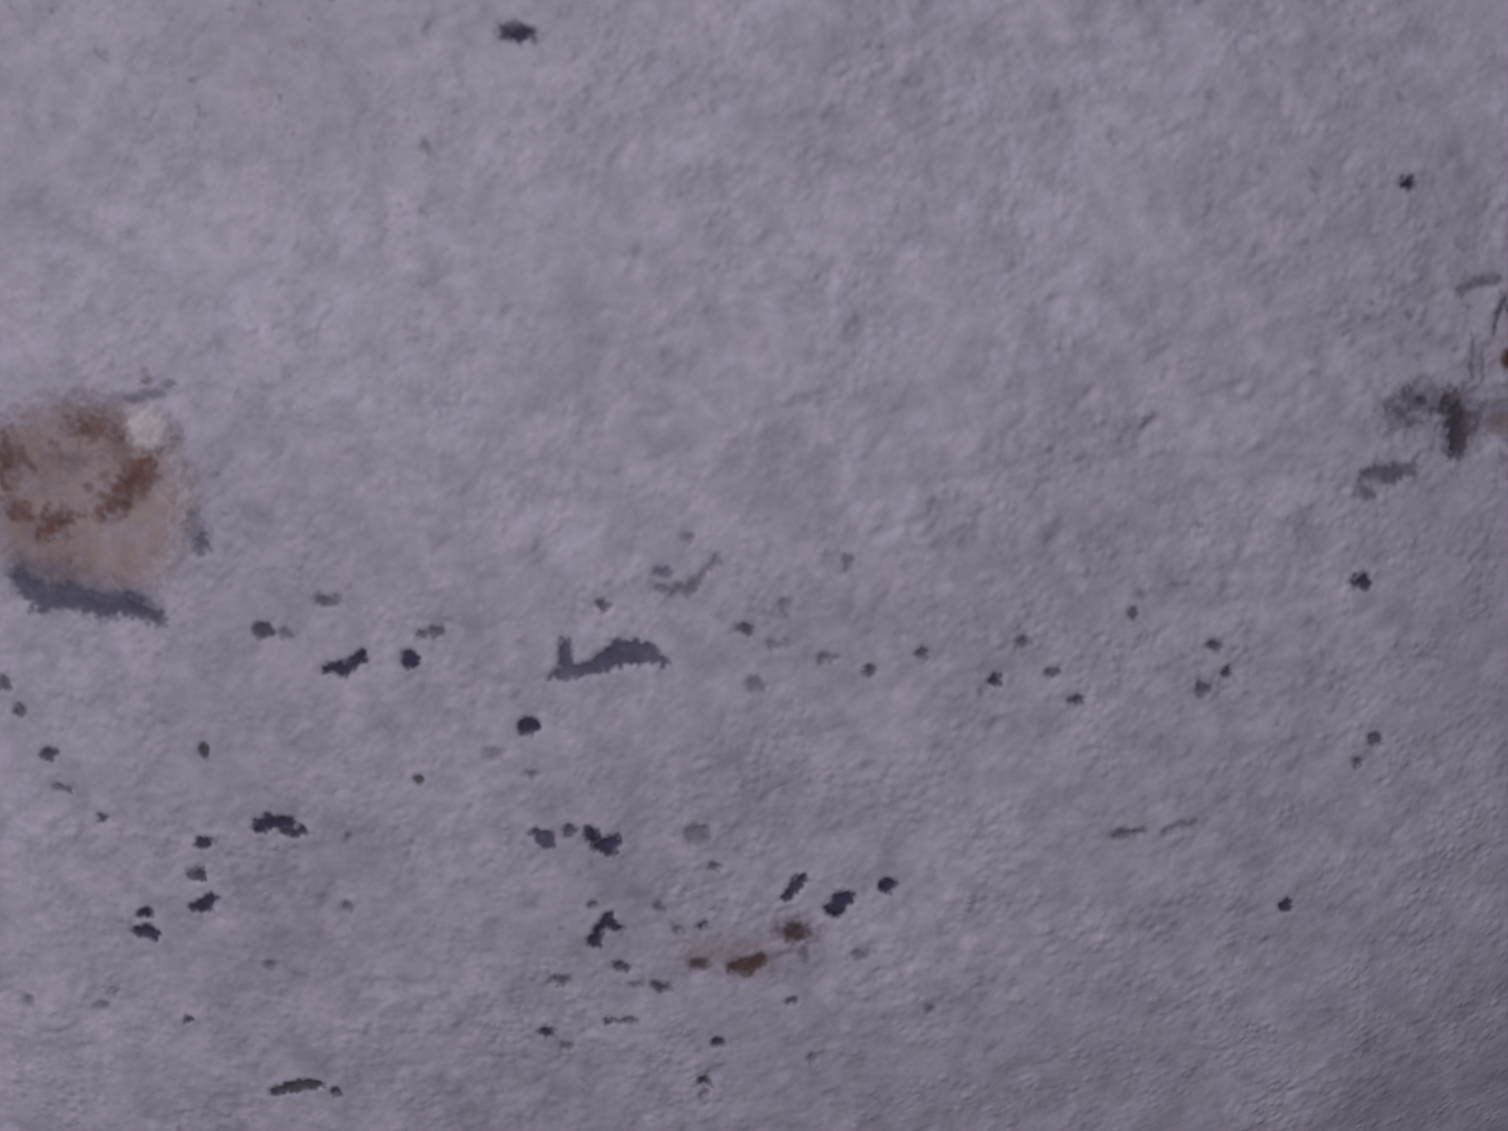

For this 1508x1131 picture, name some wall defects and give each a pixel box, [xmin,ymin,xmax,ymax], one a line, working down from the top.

peeling [322,649,367,678]
peeling [549,637,668,679]
peeling [253,813,307,837]
peeling [531,824,622,856]
peeling [781,873,806,901]
peeling [823,892,855,917]
peeling [588,902,622,947]
peeling [271,1079,341,1095]